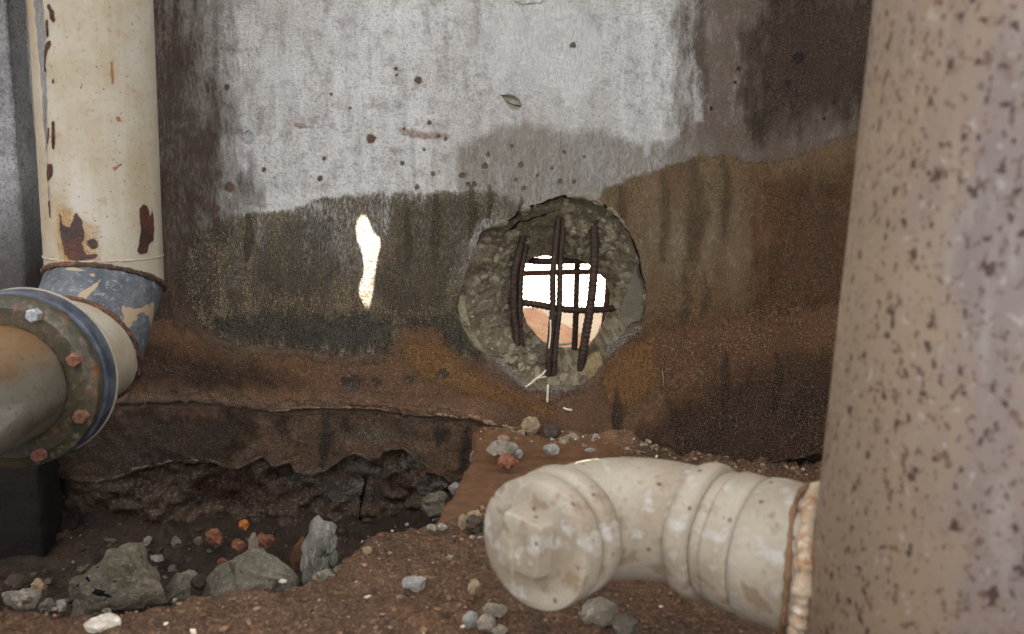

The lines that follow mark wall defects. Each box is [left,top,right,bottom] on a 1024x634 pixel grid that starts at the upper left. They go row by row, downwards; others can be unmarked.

corrosion [402,120,448,151]
water stain [153,0,873,361]
spalling [456,194,647,393]
water stain [58,407,472,483]
spalling [60,448,460,527]